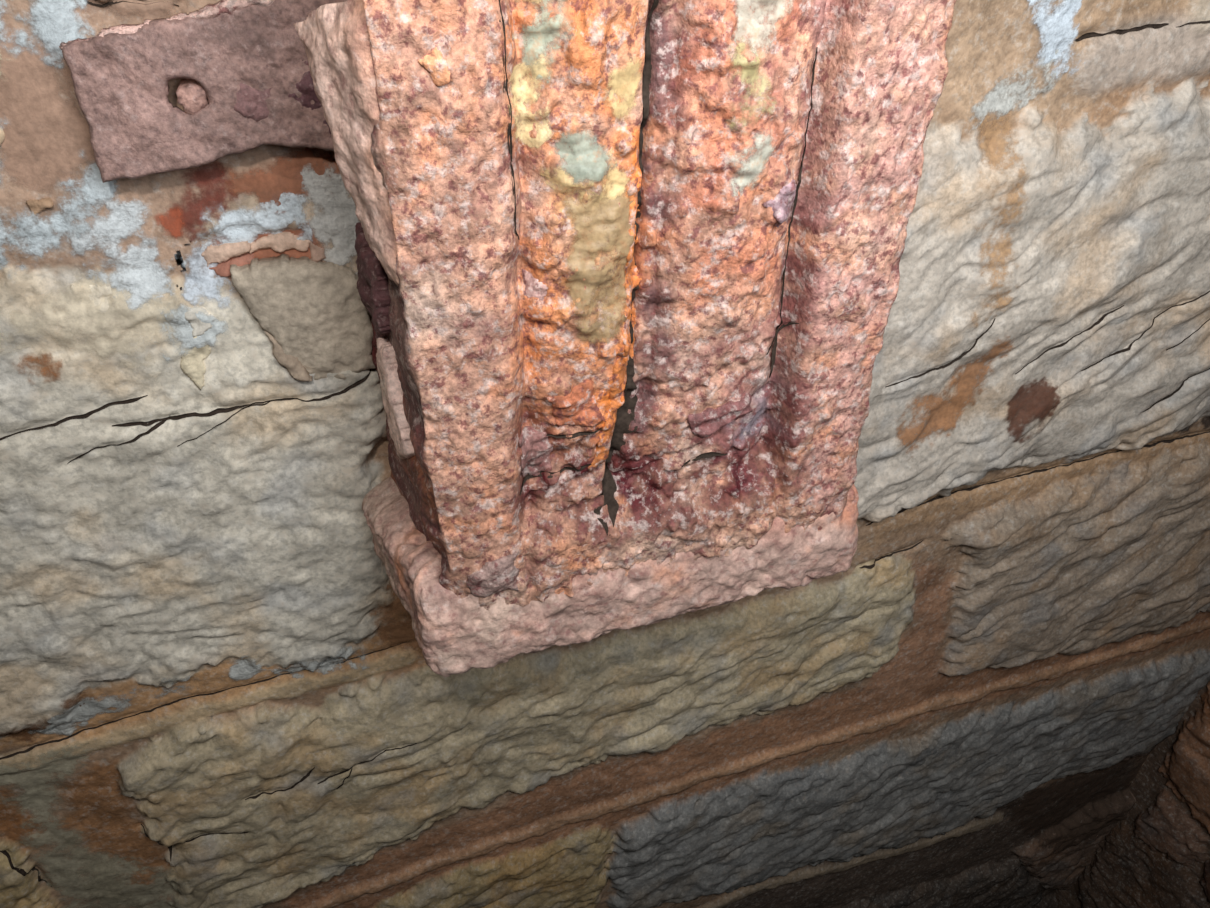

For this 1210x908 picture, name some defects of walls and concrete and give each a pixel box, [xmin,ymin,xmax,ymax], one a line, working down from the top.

leakage [0,0,94,68]
rust [59,0,274,50]
rust [234,83,272,122]
rust [288,60,331,134]
leakage [973,0,1082,129]
leakage [0,163,360,360]
spalling [201,224,326,277]
crack [0,369,371,464]
leakage [1007,377,1060,442]
rust [372,585,421,649]